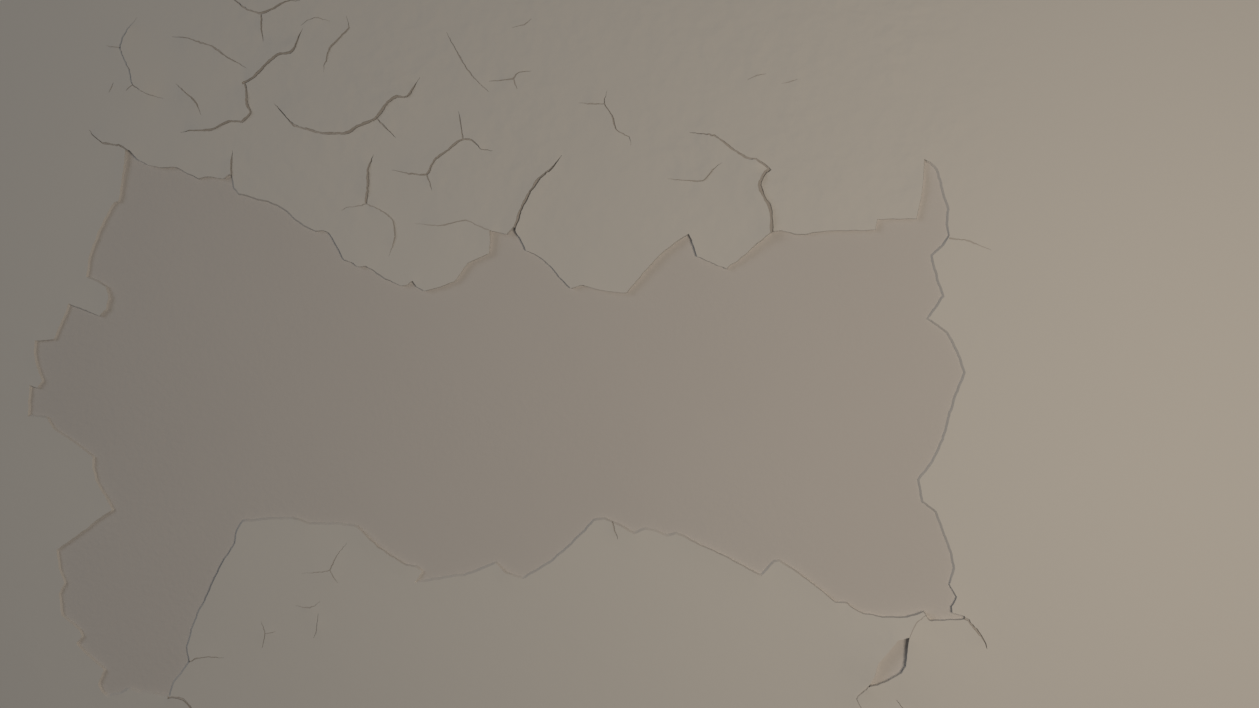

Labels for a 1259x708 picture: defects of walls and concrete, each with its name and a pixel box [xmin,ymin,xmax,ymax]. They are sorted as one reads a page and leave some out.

crack [89,130,127,150]
crack [106,0,562,255]
crack [584,92,631,141]
crack [673,132,774,232]
peeling [28,130,966,697]